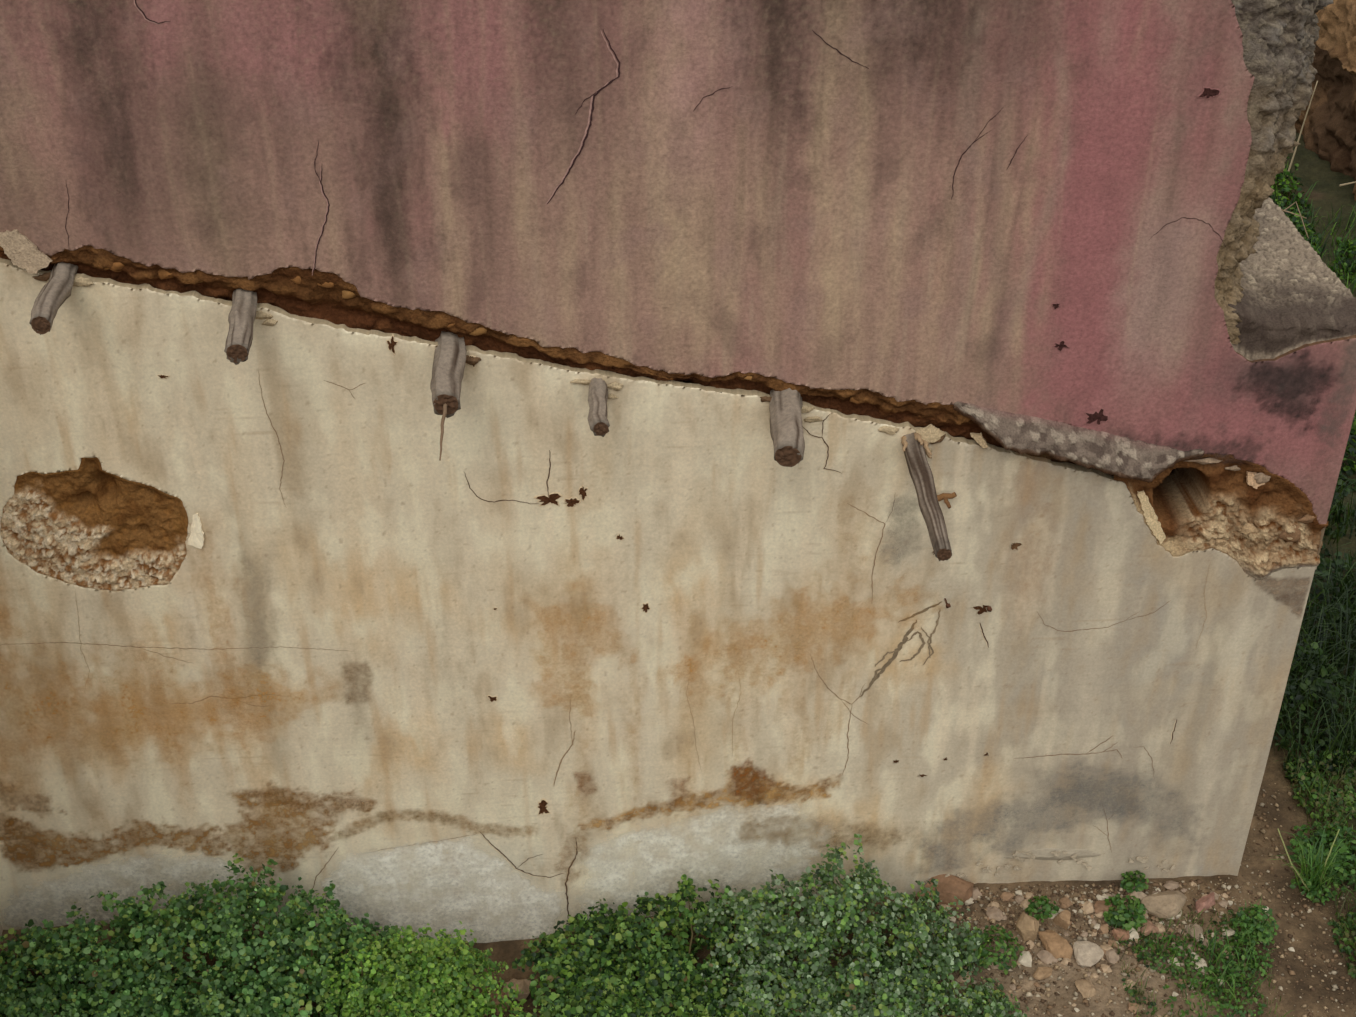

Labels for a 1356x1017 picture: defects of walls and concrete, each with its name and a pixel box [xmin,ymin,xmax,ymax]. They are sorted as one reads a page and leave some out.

flaking render [1196,87,1221,99]
crack [545,30,620,205]
flaking render [0,229,53,274]
flaking render [386,334,398,355]
flaking render [916,424,946,443]
flaking render [970,433,988,448]
spalling [1,457,204,591]
spalling [1114,453,1329,580]
crack [811,657,867,772]